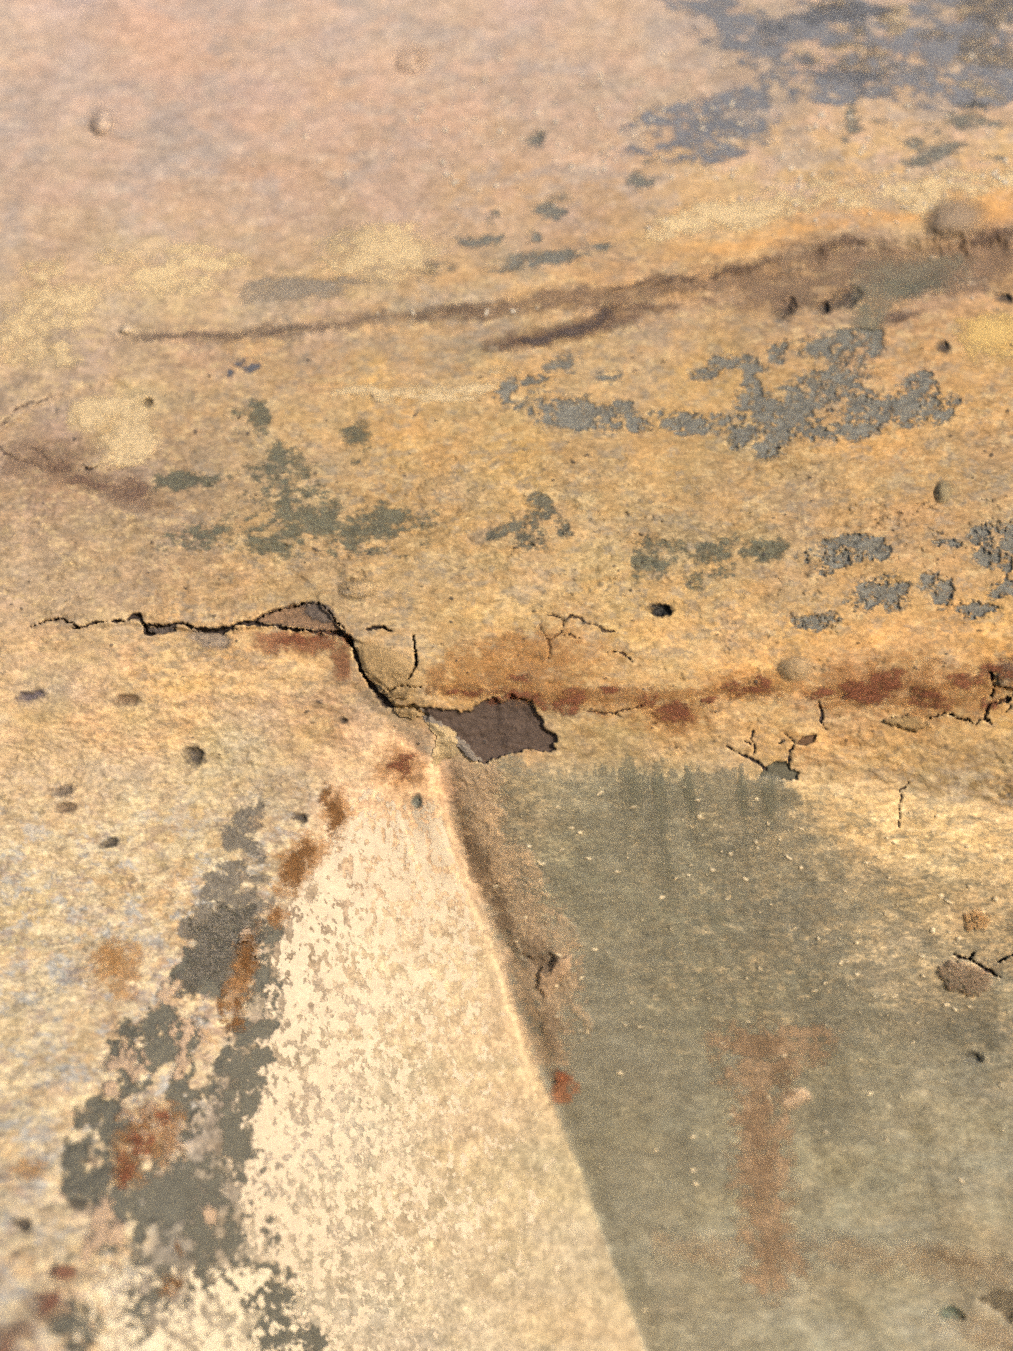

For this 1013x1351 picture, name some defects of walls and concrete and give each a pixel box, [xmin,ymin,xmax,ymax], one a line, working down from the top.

damp [419,229,1013,351]
peeling [331,287,962,462]
crack [0,396,52,470]
peeling [631,521,1013,633]
crack [30,603,422,708]
rust [448,674,623,716]
rust [640,674,771,725]
rust [812,668,950,711]
peeling [358,644,594,1049]
rust [218,990,246,1032]
peeling [47,784,576,1351]
damp [451,755,1013,1351]